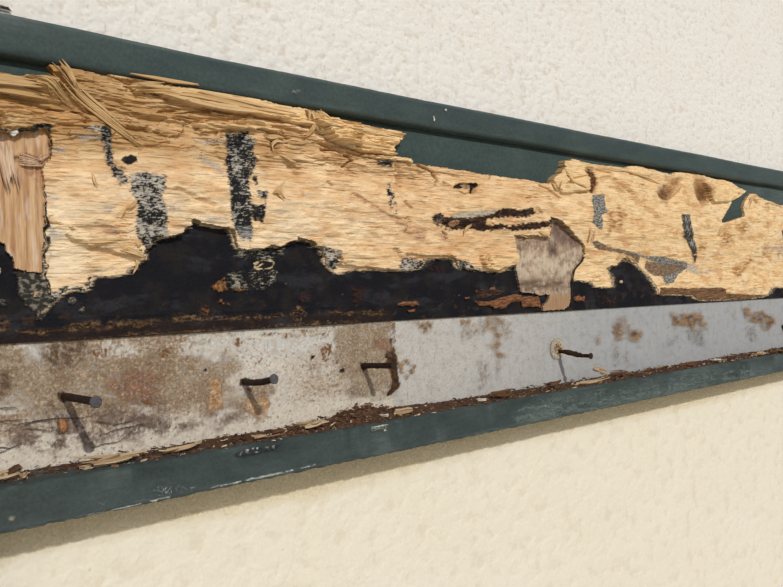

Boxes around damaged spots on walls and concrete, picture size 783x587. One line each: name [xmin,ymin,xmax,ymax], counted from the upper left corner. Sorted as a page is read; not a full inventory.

peeling [248,150,269,222]
spalling [432,208,551,231]
peeling [253,259,274,270]
peeling [212,278,227,292]
peeling [465,286,542,309]
rust [614,323,641,341]
rust [672,314,707,344]
rust [744,308,775,339]
rust [43,339,84,366]
rust [385,322,416,396]
rust [233,378,275,421]
crack [0,403,145,453]